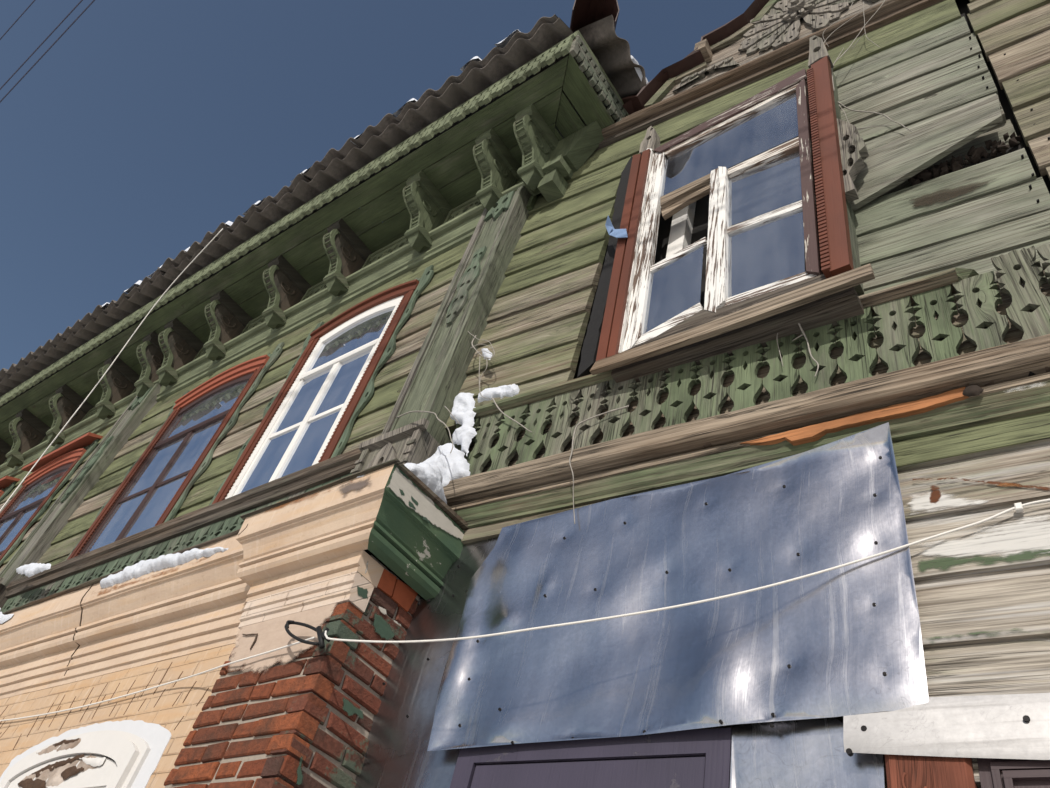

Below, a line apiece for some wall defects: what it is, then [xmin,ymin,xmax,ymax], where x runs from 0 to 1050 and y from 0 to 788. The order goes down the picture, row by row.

peeling [387,467,464,540]
rust [913,478,1050,503]
peeling [919,549,1050,572]
crack [0,584,209,750]
flaking render [18,738,106,788]